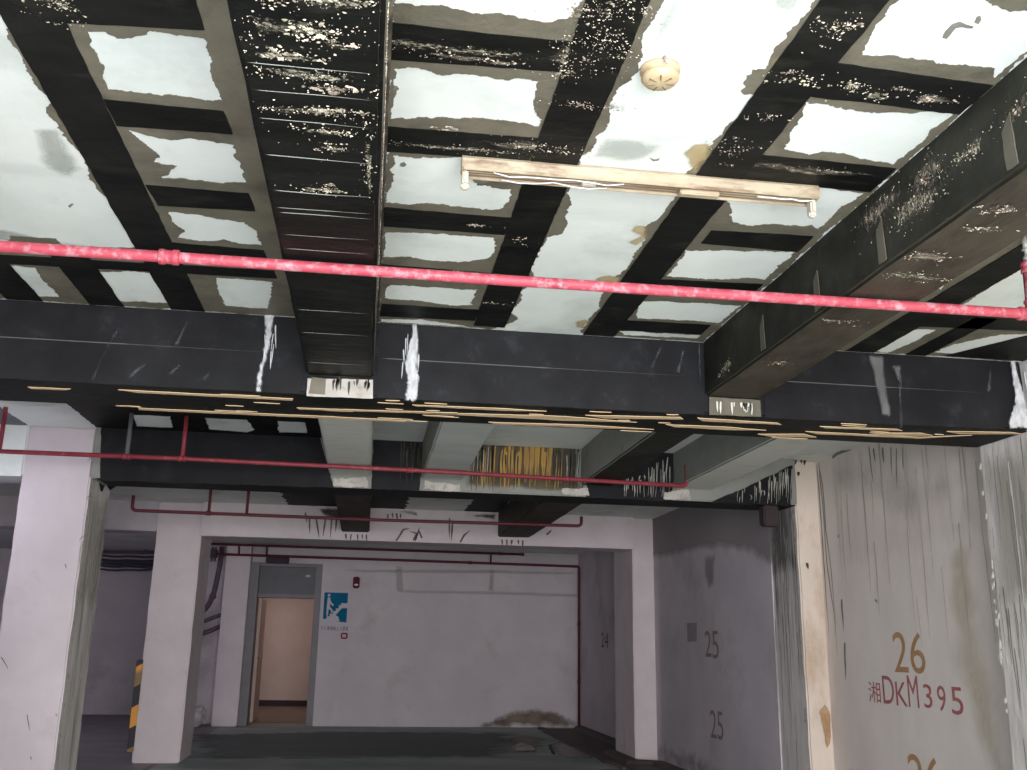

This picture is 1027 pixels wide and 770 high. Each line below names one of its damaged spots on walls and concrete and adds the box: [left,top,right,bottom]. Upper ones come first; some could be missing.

leakage [652,443,949,755]
leakage [944,437,1027,769]